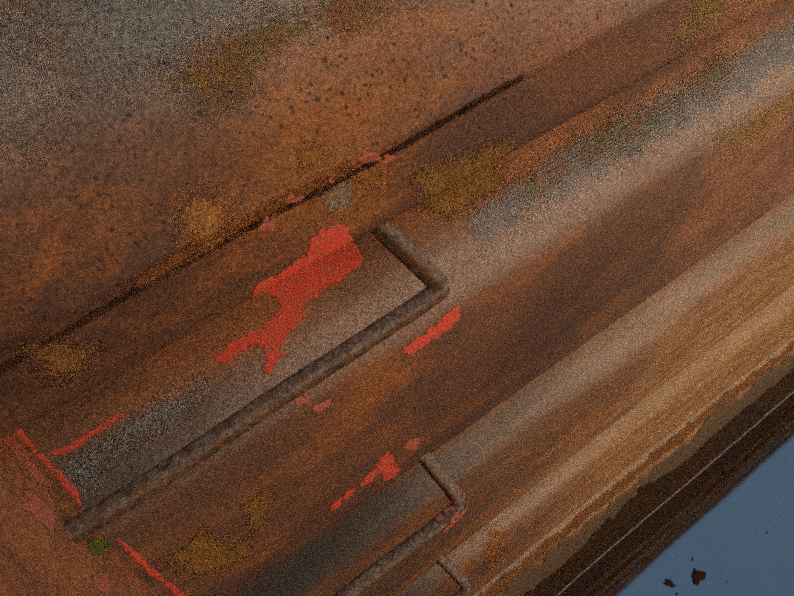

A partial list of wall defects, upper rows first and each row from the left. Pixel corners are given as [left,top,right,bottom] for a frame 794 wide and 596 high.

peeling [358,150,396,165]
corrosion [182,197,228,251]
peeling [257,214,277,232]
peeling [214,224,364,374]
peeling [403,305,461,355]
corrosion [25,343,90,375]
peeling [0,412,121,531]
peeling [329,452,401,511]
peeling [431,486,467,533]
corrosion [481,341,794,596]
peeling [501,354,794,596]
peeling [117,539,186,596]